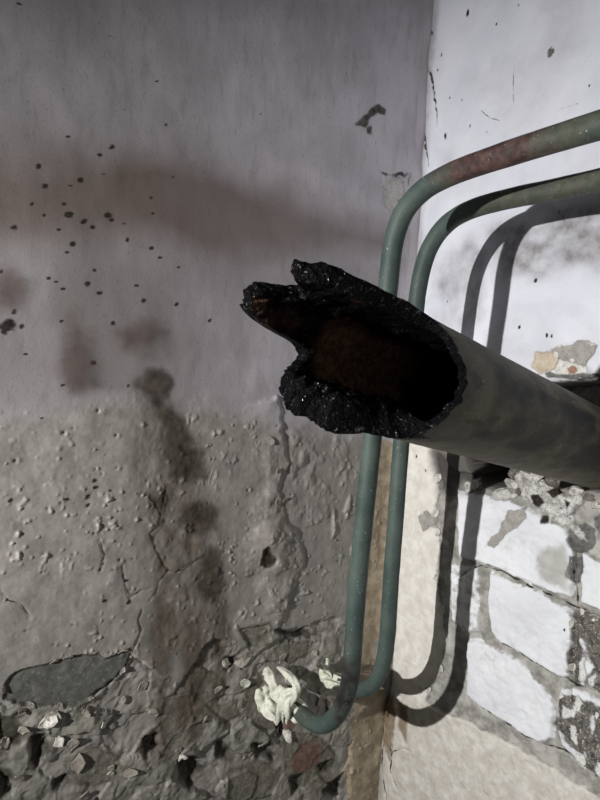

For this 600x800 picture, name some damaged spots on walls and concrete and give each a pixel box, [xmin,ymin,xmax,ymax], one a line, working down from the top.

damp [0,309,23,334]
flaking render [531,340,600,381]
damp [127,370,204,478]
crack [99,487,200,677]
damp [181,503,216,534]
damp [198,550,224,601]
spalling [464,478,482,495]
spalling [488,468,600,585]
peeling [0,648,138,800]
spalling [140,656,339,800]
spalling [238,622,318,664]
peeling [554,608,600,777]